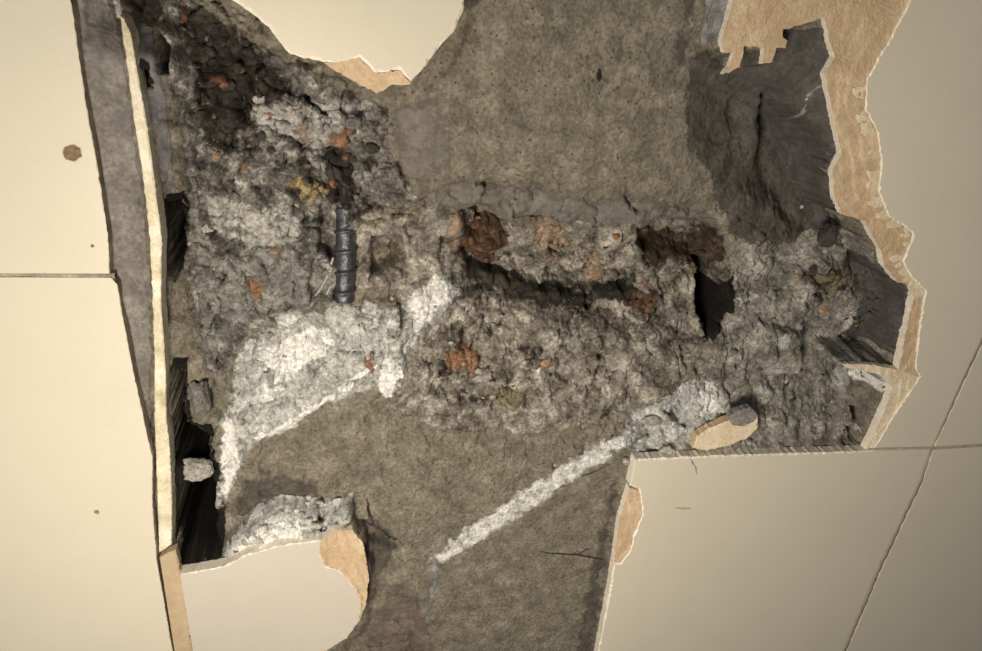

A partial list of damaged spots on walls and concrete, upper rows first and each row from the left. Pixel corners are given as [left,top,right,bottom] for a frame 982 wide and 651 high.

peeling [63,145,82,161]
corrosion [444,211,503,265]
spalling [132,0,927,461]
spalling [70,0,173,651]
corrosion [443,342,479,380]
peeling [182,524,369,637]
peeling [598,482,644,651]